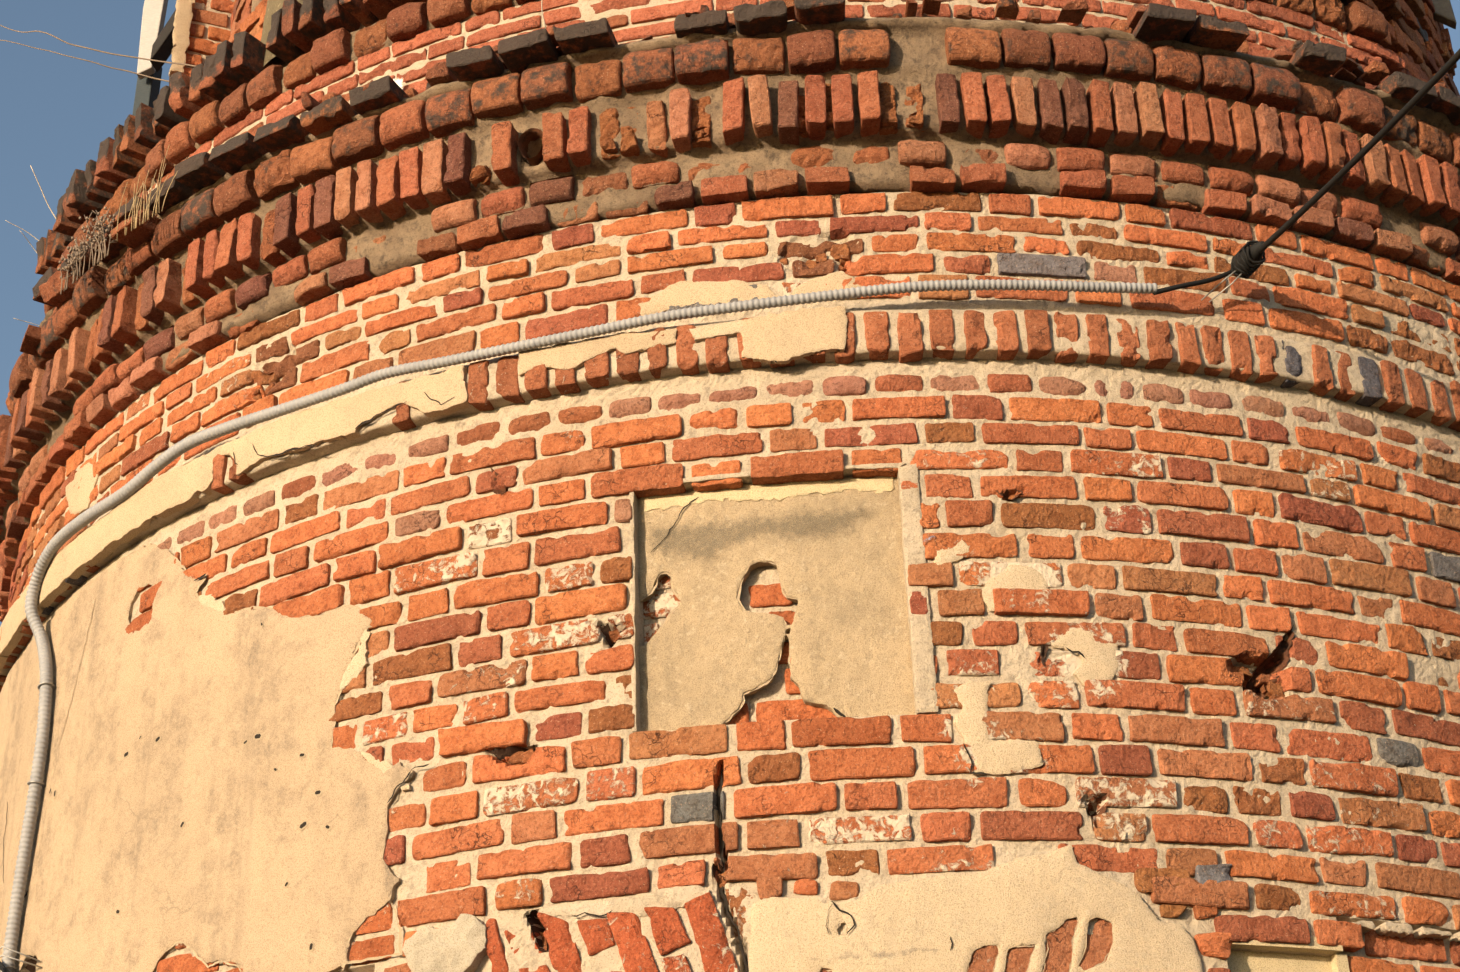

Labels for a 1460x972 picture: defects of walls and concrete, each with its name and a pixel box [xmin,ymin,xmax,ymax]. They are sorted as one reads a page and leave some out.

peeling [102,544,393,773]
flaking render [723,561,892,784]
hole [485,744,536,765]
crack [716,769,749,972]
flaking render [340,900,403,969]
spalling [526,910,548,952]
crack [826,901,855,935]
flaking render [967,917,1113,972]